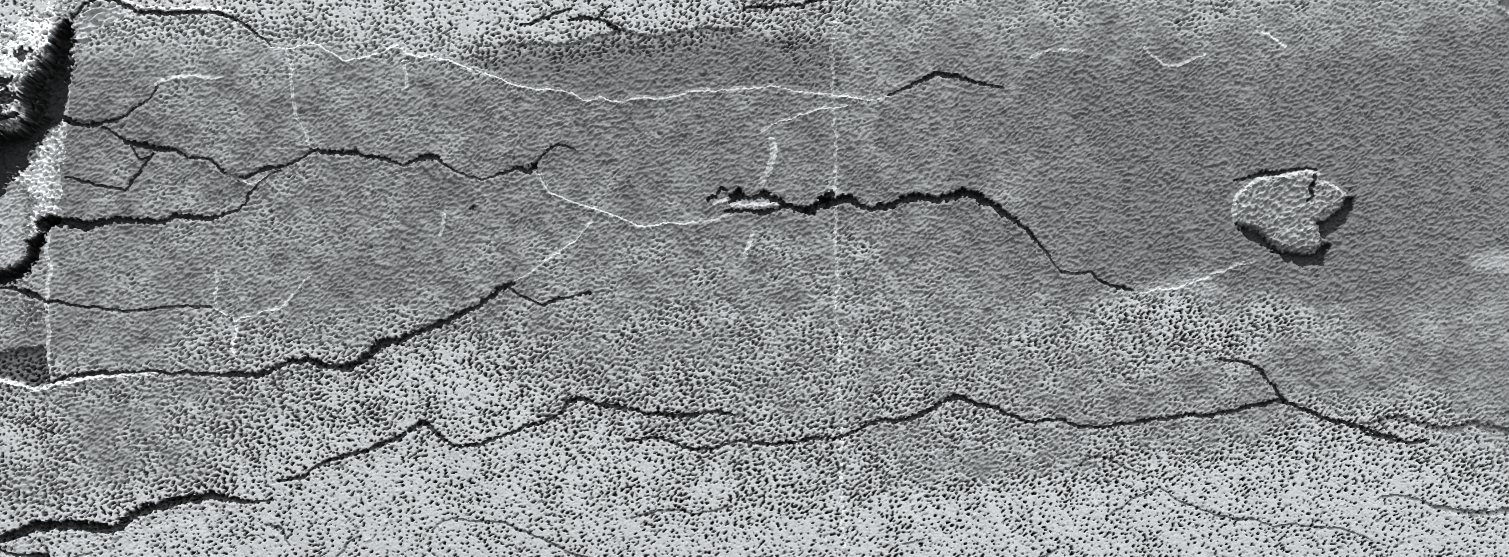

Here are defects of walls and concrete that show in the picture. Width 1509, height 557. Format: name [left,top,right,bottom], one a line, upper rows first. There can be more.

crack [0,111,20,121]
crack [34,0,1509,452]
crack [0,395,736,557]